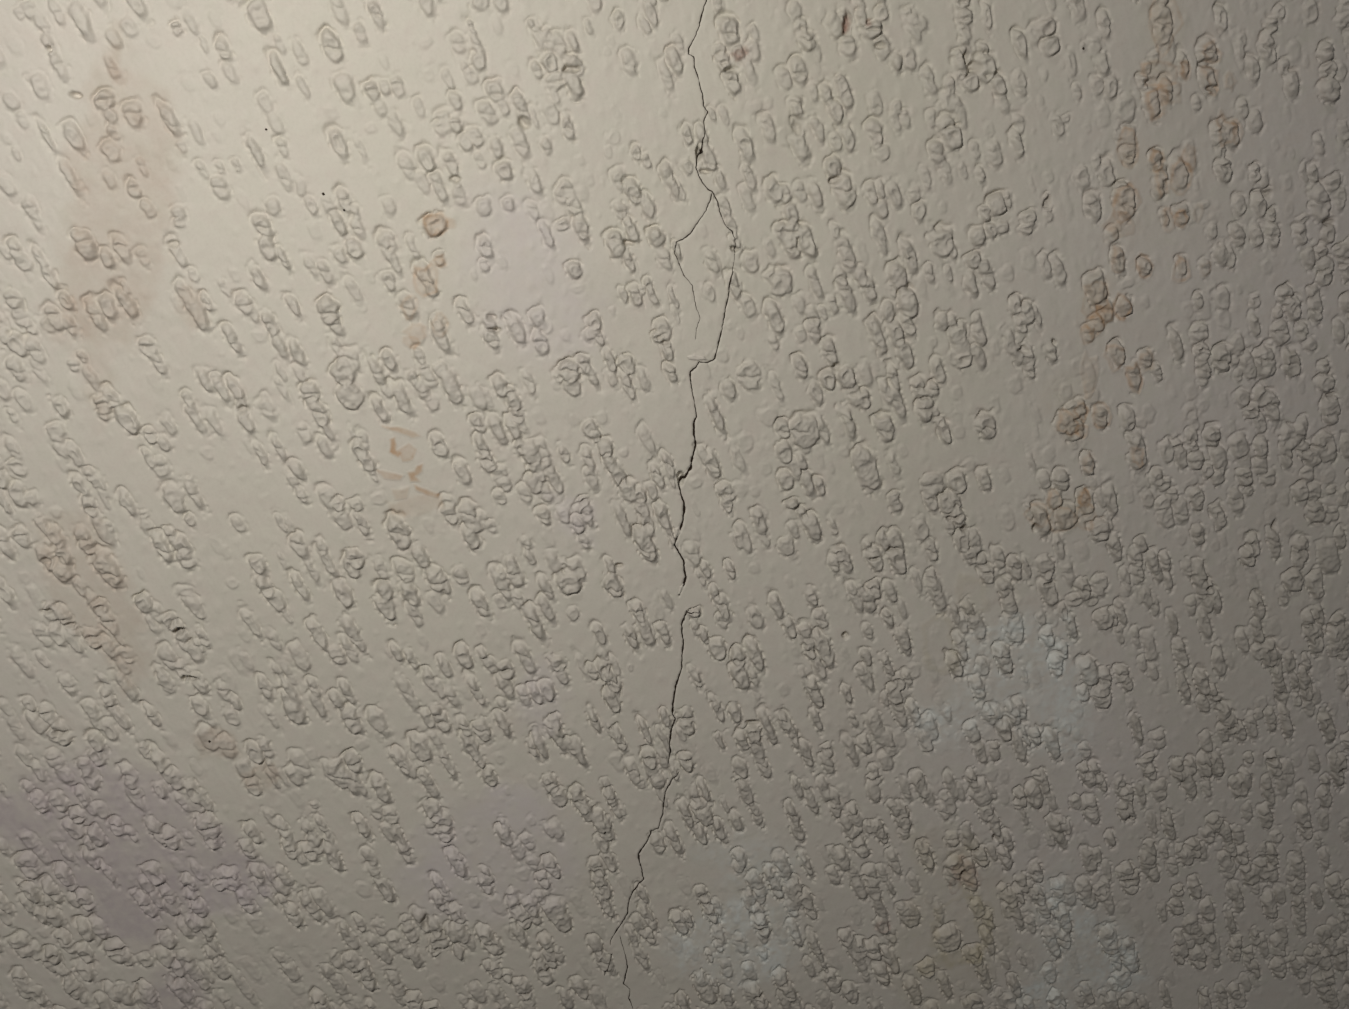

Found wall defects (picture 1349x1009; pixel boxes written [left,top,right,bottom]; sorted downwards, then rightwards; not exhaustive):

crack [604,0,736,1008]